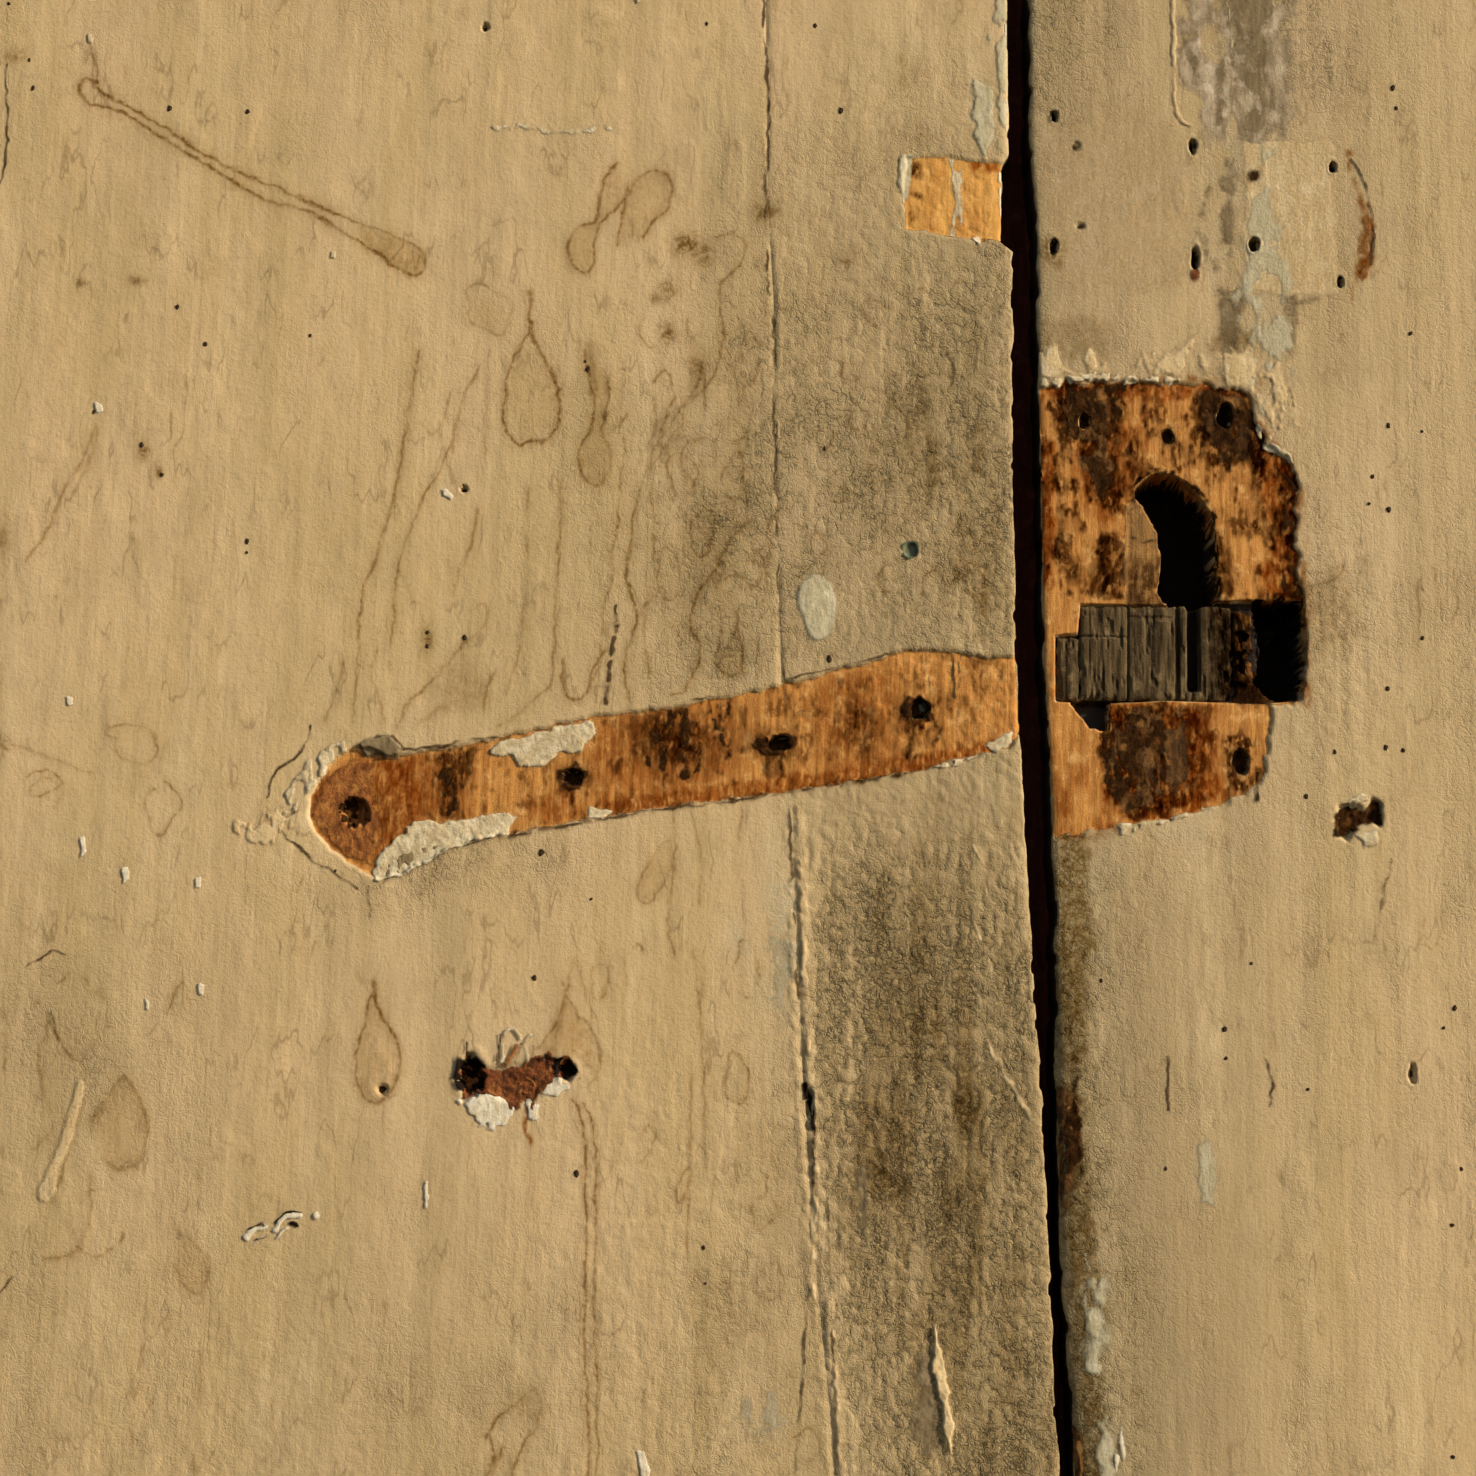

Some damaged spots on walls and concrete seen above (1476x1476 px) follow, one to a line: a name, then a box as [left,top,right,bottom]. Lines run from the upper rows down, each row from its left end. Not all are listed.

peeling [898,0,1008,244]
peeling [1171,0,1297,144]
crack [762,0,781,612]
spalling [1335,793,1382,848]
spalling [453,1056,486,1094]
spalling [551,1057,578,1076]
leakage [984,1030,1033,1121]
leakage [913,1350,940,1459]